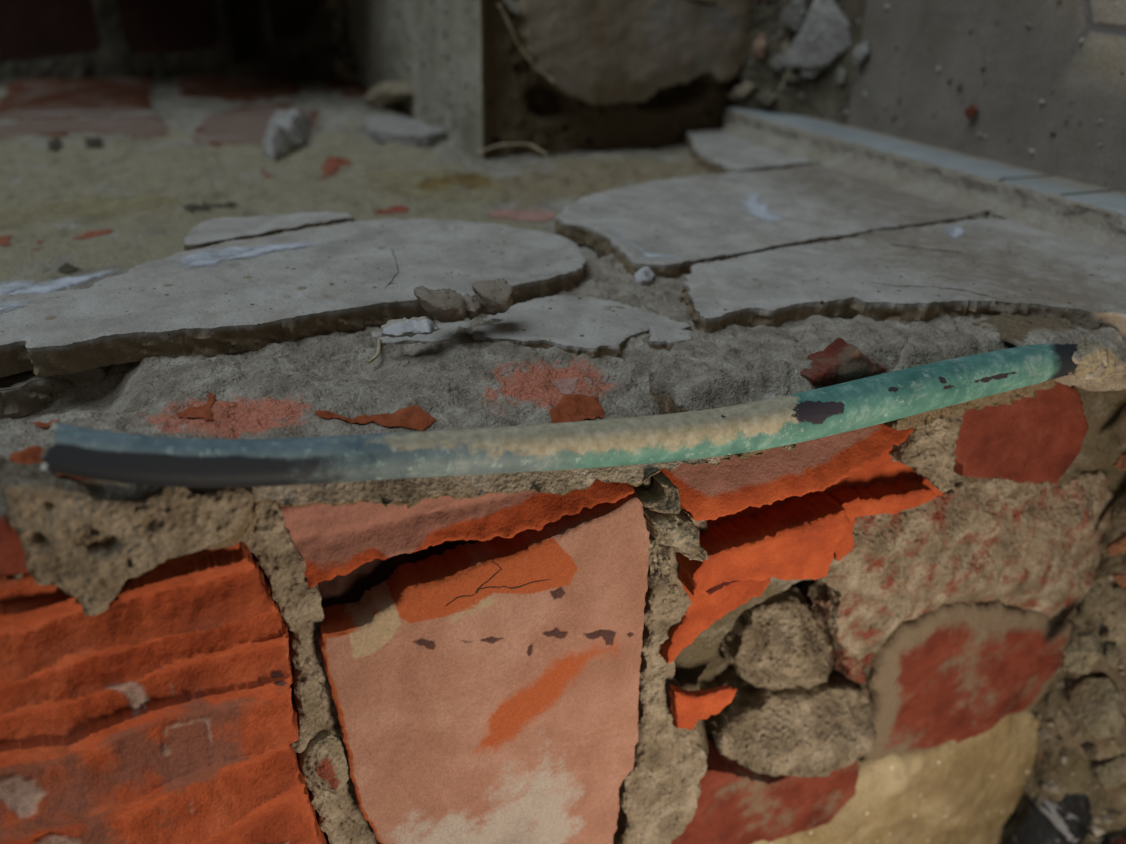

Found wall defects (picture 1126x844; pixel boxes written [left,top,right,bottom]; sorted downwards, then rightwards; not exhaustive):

crack [597,248,607,259]
crack [694,211,992,262]
flaking render [174,392,217,421]
flaking render [314,403,436,431]
flaking render [549,377,604,423]
flaking render [7,446,44,465]
spalling [647,312,1126,664]
spalling [0,479,650,844]
spalling [671,739,860,844]